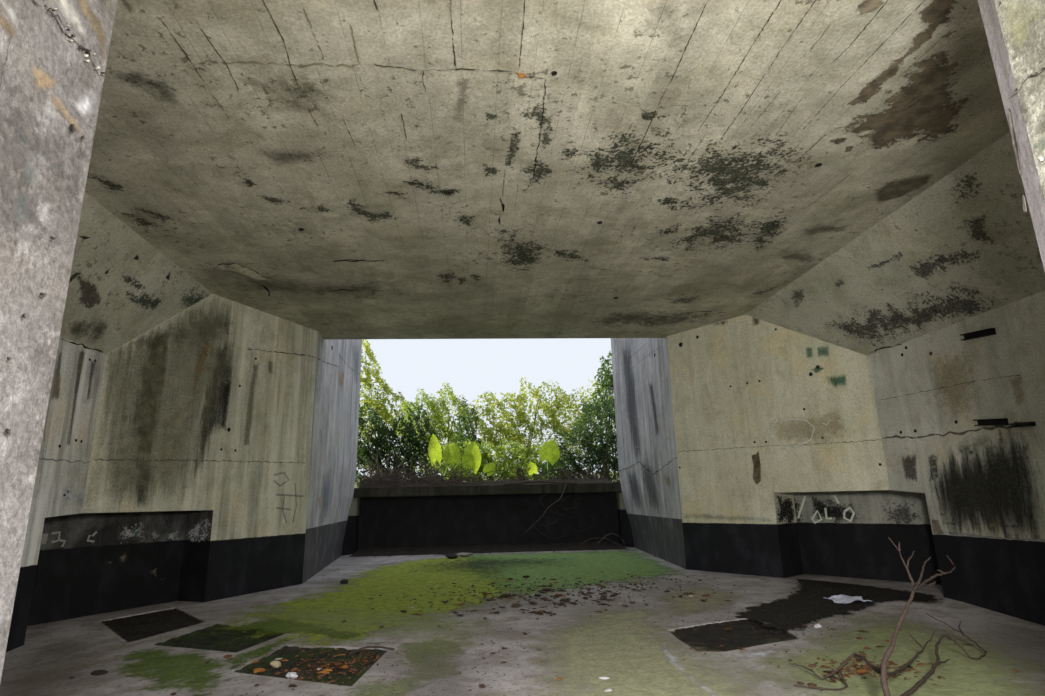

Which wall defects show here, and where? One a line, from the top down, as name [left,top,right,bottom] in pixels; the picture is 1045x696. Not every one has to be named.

crack [33,0,101,80]
crack [222,61,546,178]
damp [386,159,460,196]
damp [483,133,552,193]
damp [518,105,554,148]
damp [561,111,811,261]
damp [77,276,101,308]
damp [497,229,588,270]
damp [824,215,994,346]
damp [108,285,232,503]
crack [805,422,1034,445]
damp [929,432,1039,539]